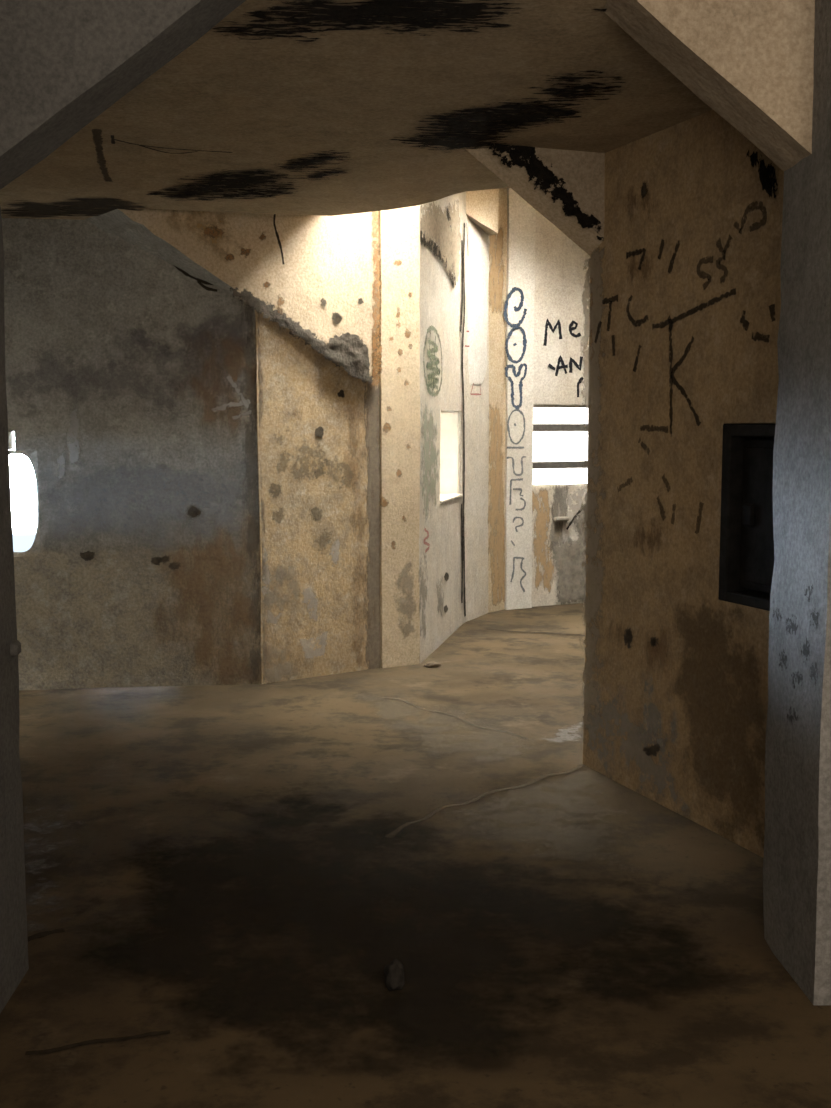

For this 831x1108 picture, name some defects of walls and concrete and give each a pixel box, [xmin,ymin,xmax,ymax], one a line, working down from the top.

spalling [230,287,373,384]